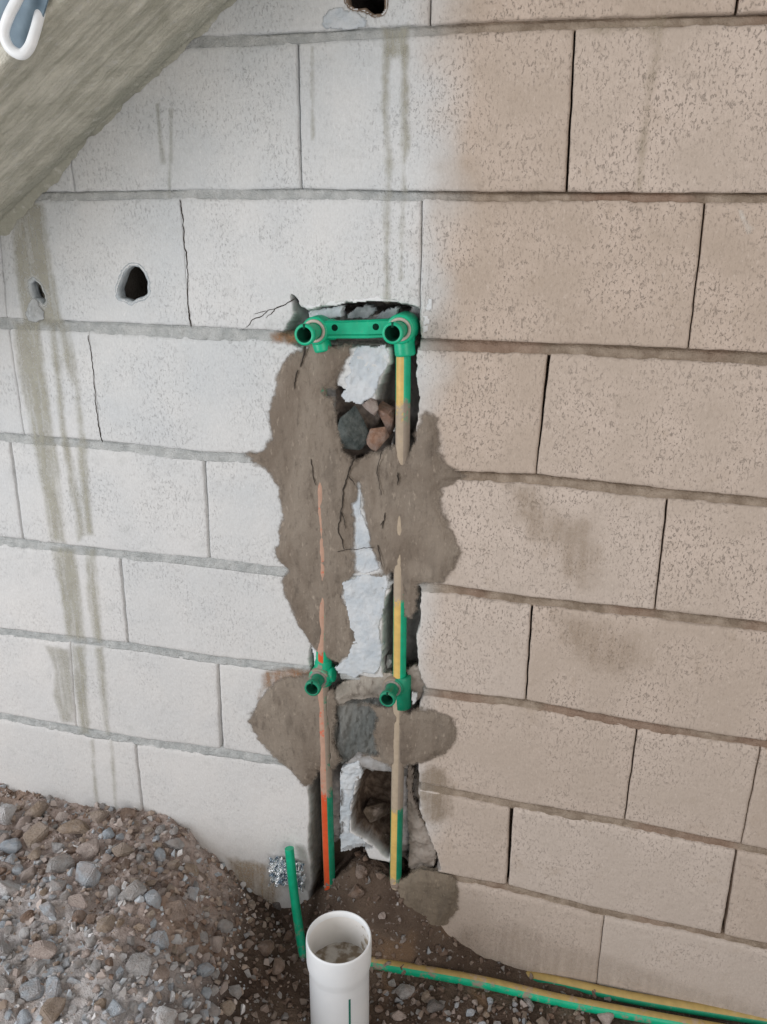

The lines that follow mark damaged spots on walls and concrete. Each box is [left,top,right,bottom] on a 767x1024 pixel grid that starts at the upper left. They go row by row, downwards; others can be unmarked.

crack [180,201,192,327]
crack [247,298,296,327]
crack [88,339,103,442]
water stain [16,205,91,726]
crack [338,450,399,564]